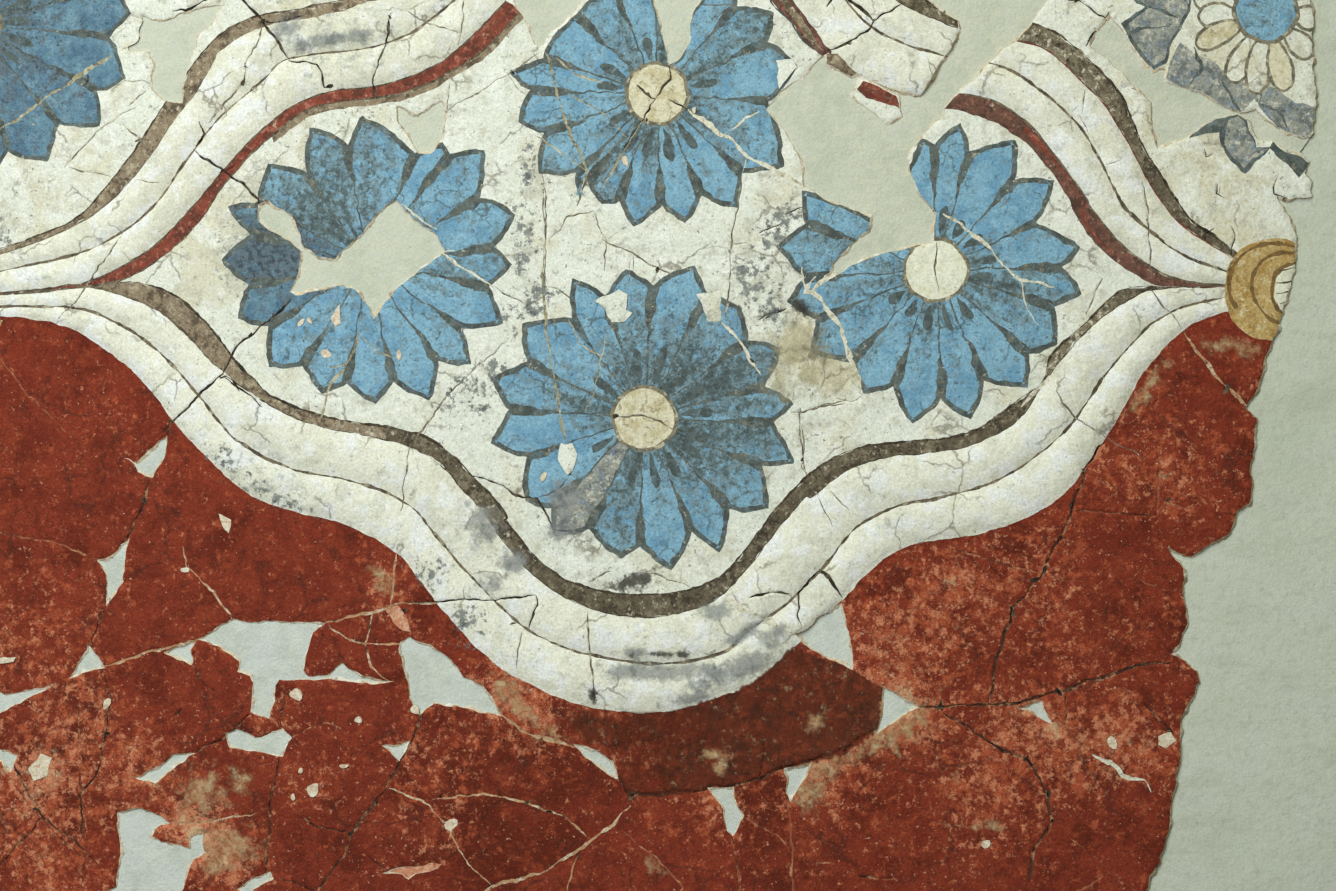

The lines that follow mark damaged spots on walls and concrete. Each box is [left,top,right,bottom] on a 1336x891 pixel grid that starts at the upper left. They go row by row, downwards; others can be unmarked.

crack [826,0,901,51]
crack [193,0,333,204]
flaking render [766,0,1047,277]
flaking render [258,200,445,319]
crack [400,51,862,534]
crack [162,299,292,440]
flaking render [97,538,130,606]
flaking render [164,567,619,781]
crack [325,551,539,681]
crack [749,569,843,626]
flaking render [794,603,853,670]
flaking render [109,808,274,891]